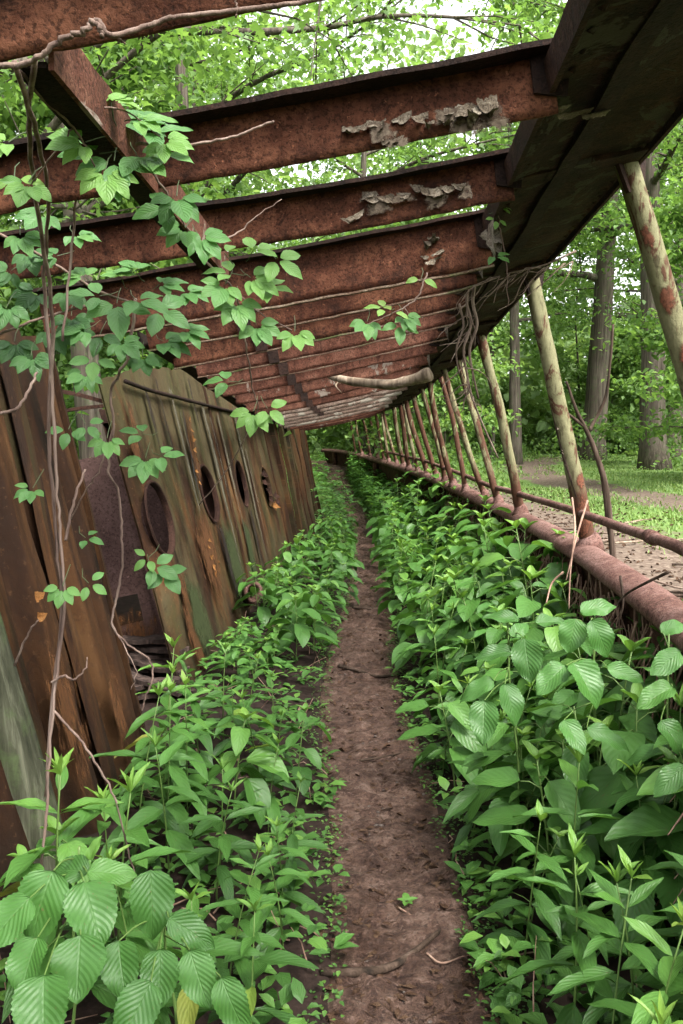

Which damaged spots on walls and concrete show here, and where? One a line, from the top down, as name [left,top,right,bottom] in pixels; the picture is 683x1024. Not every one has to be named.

peeling [342,94,511,150]
peeling [340,182,473,224]
peeling [420,233,444,265]
rust [640,224,655,248]
rust [660,285,675,315]
rust [187,414,202,489]
rust [195,508,224,606]
rust [179,572,207,671]